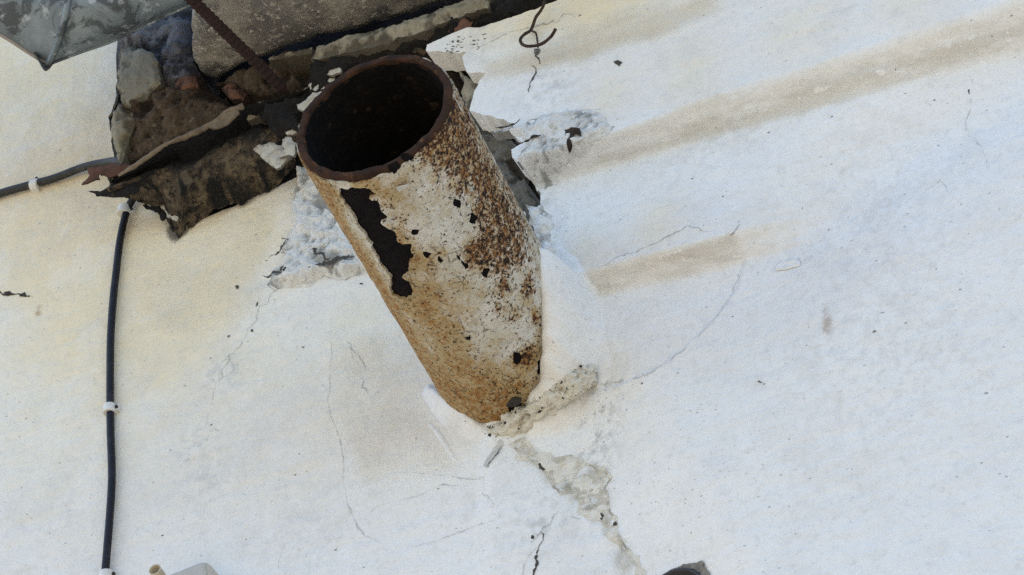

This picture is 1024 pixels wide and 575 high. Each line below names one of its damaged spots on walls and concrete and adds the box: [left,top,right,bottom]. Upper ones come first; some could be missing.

peeling [263,68,646,575]
crack [523,526,545,575]